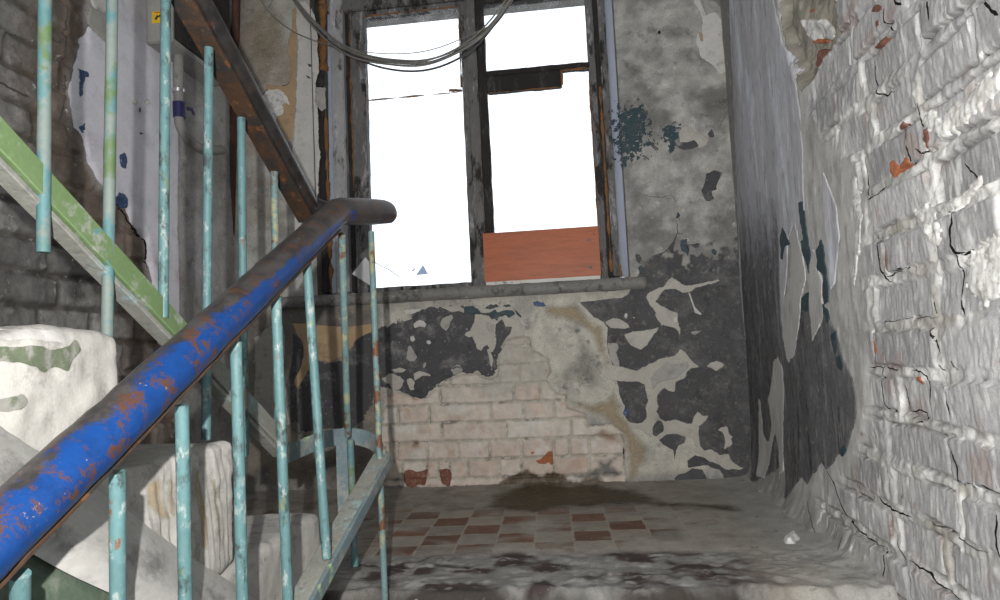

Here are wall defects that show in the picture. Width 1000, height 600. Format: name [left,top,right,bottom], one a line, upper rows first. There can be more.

crack [984,0,998,16]
peeling [68,0,106,185]
peeling [116,0,180,314]
spalling [890,158,915,178]
crack [905,104,930,165]
flaking render [254,0,857,499]
crack [877,236,910,282]
crack [948,212,974,314]
damp [550,307,603,352]
crack [871,302,958,423]
damp [587,399,644,476]
crack [827,451,1000,599]